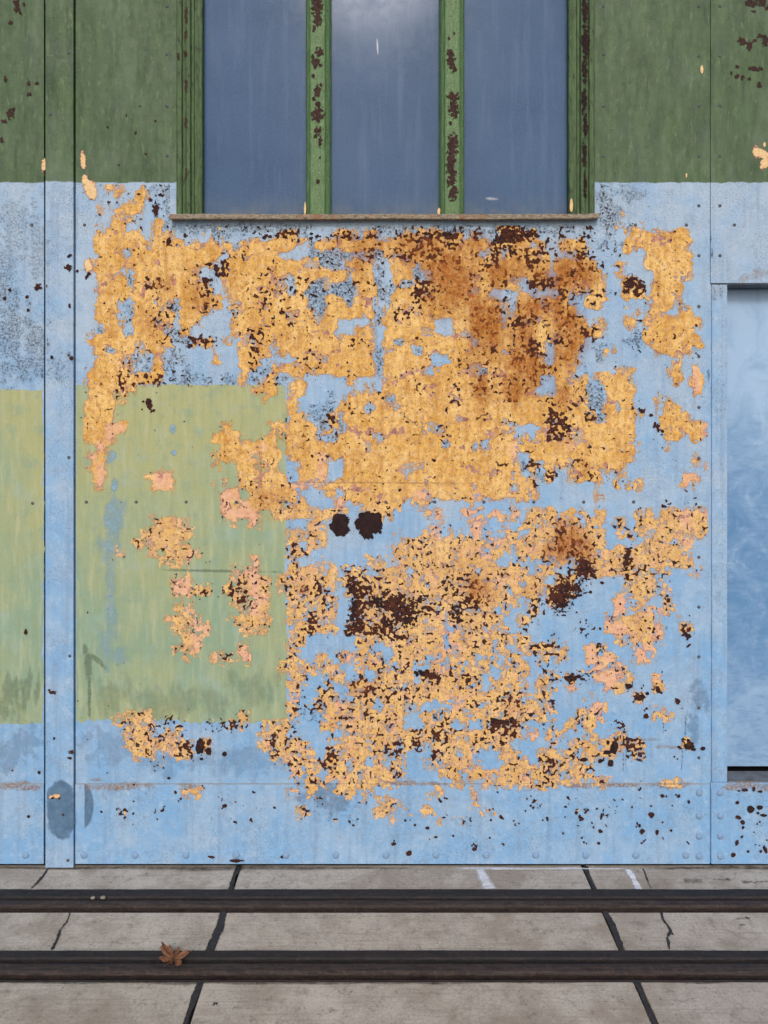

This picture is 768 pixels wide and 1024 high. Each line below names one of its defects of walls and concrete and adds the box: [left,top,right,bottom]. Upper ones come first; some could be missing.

rust [493,229,534,244]
peeling [80,151,708,826]
rust [329,511,383,540]
rust [345,580,426,637]
rust [625,662,683,731]
water stain [47,781,93,839]
rust [556,719,659,845]
rust [636,776,690,844]
rust [723,782,768,858]
crack [50,913,70,950]
crack [660,912,674,949]